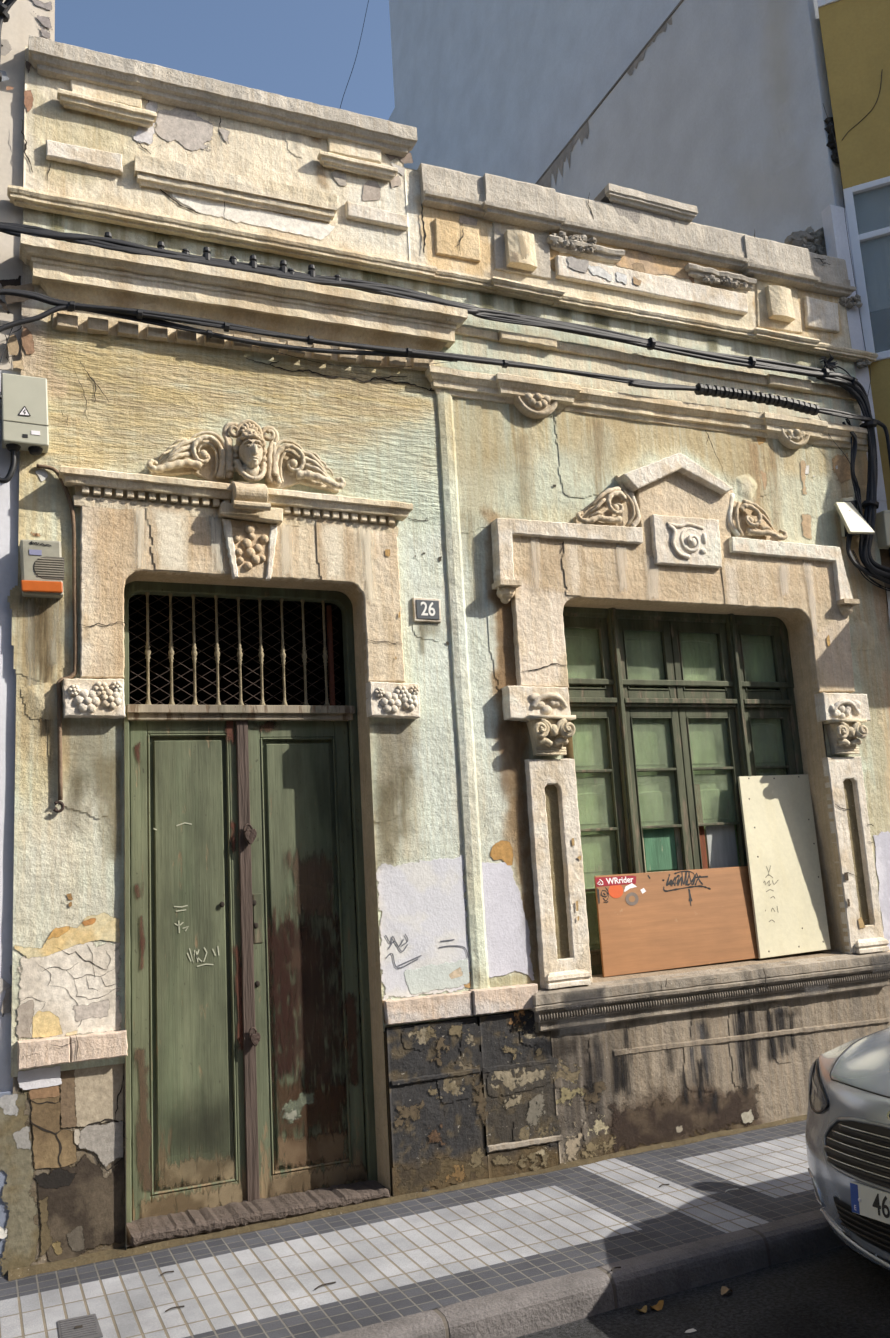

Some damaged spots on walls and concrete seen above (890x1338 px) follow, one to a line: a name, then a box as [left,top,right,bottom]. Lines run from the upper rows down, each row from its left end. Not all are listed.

peeling [134,101,230,151]
peeling [164,190,335,240]
crack [246,358,456,401]
rust [258,721,276,732]
leakage [369,712,427,856]
peeling [0,912,122,1040]
rust [265,850,359,1139]
peeling [449,967,471,988]
leakage [559,988,796,1152]
spalling [17,1063,124,1262]